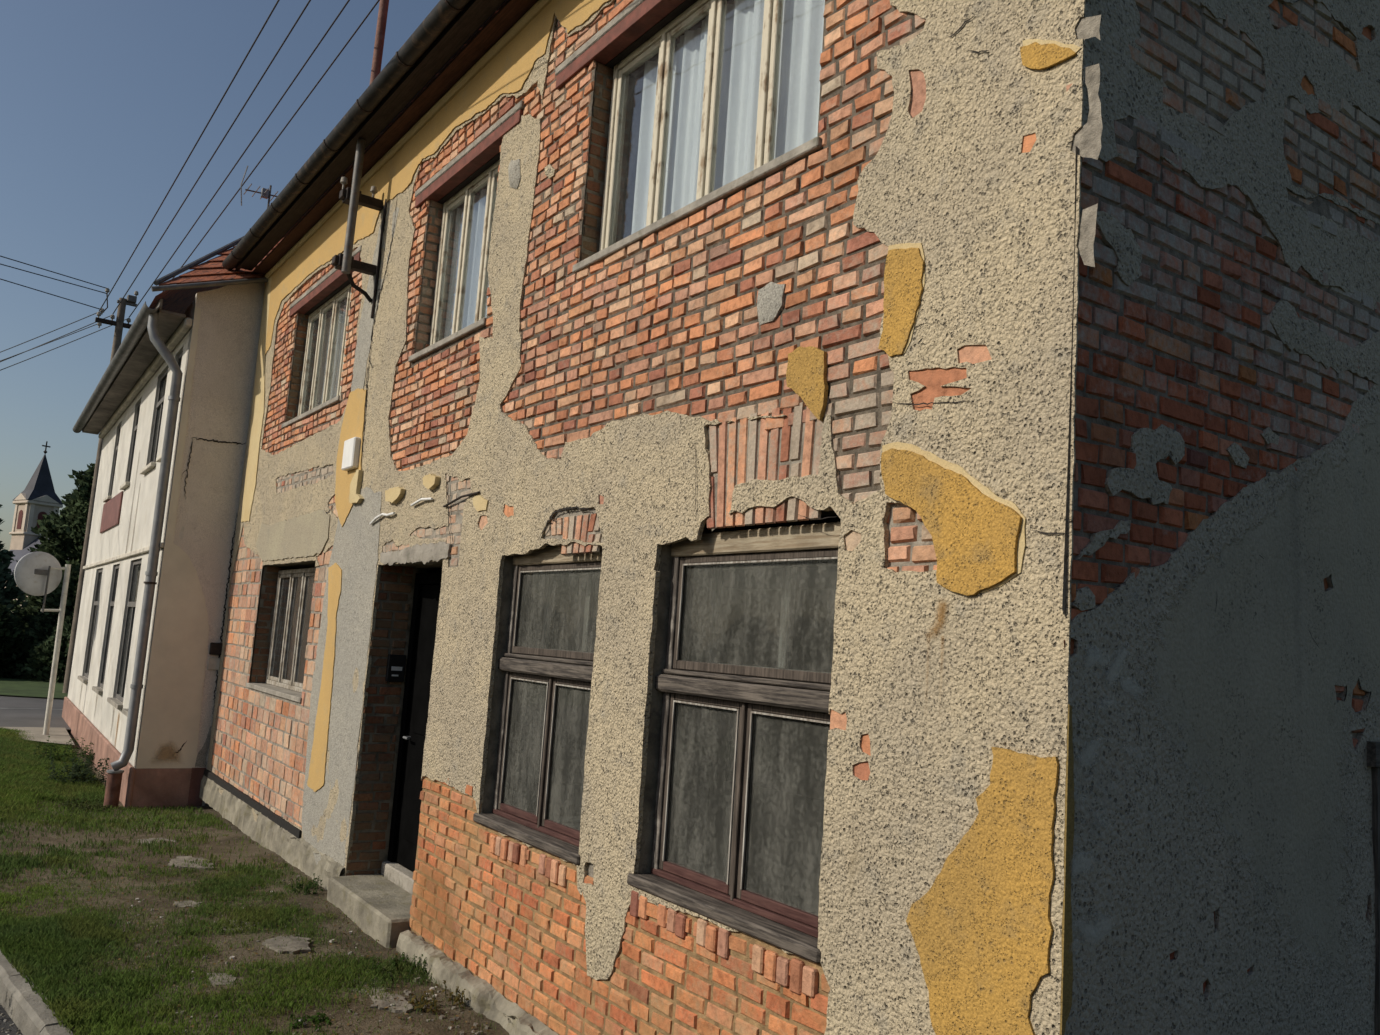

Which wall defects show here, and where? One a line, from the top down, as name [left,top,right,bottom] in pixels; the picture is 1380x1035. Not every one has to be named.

spalling [195,0,1026,876]
spalling [409,776,830,1035]
peeling [906,704,1075,1035]
spalling [1020,15,1380,1006]